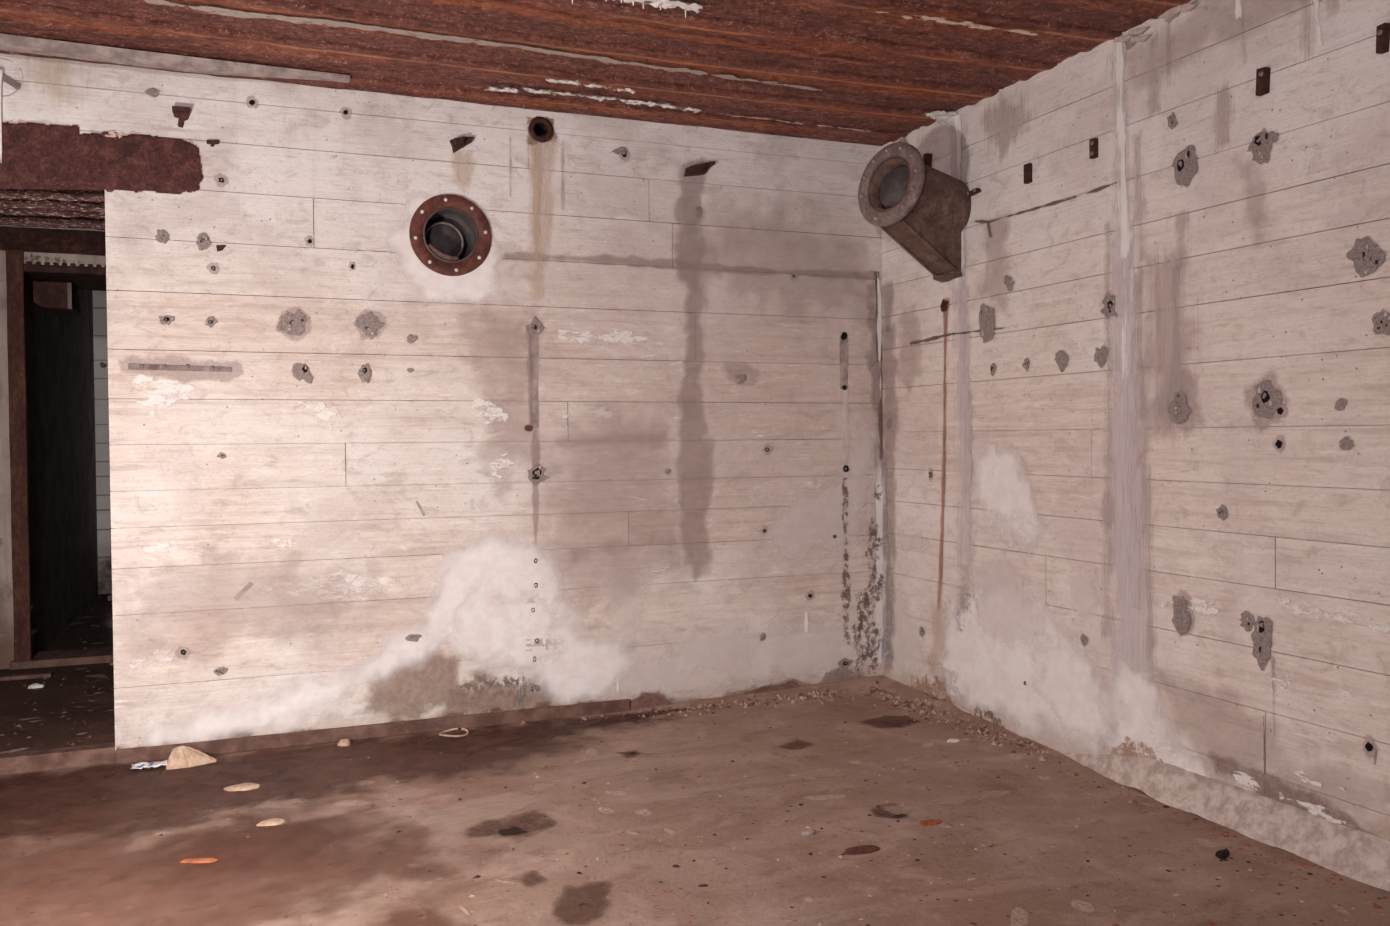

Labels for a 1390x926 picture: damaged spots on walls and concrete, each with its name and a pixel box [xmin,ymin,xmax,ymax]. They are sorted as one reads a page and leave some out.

leakage [485,79,701,113]
spalling [1172,145,1198,187]
spalling [1247,128,1278,164]
leakage [389,194,499,303]
spalling [1346,236,1385,277]
leakage [908,36,1214,779]
spalling [1246,375,1287,452]
rust [938,299,949,612]
leakage [0,390,922,926]
spalling [1150,591,1219,635]
spalling [1240,596,1390,692]
leakage [1213,756,1373,835]